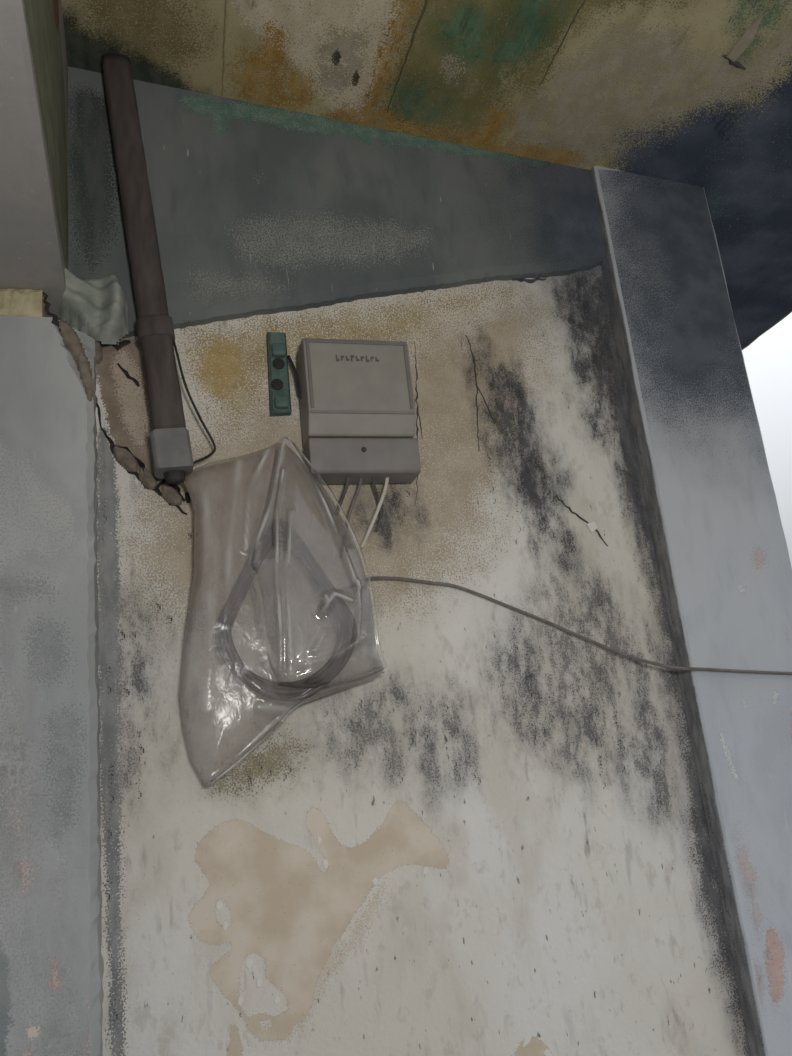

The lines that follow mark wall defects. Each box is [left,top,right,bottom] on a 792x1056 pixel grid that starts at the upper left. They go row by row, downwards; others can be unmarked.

water stain [63,7,207,277]
water stain [229,0,407,116]
corrosion [217,0,592,167]
water stain [201,723,314,806]
water stain [324,684,481,799]
water stain [492,566,678,823]
peeling [188,800,449,1056]